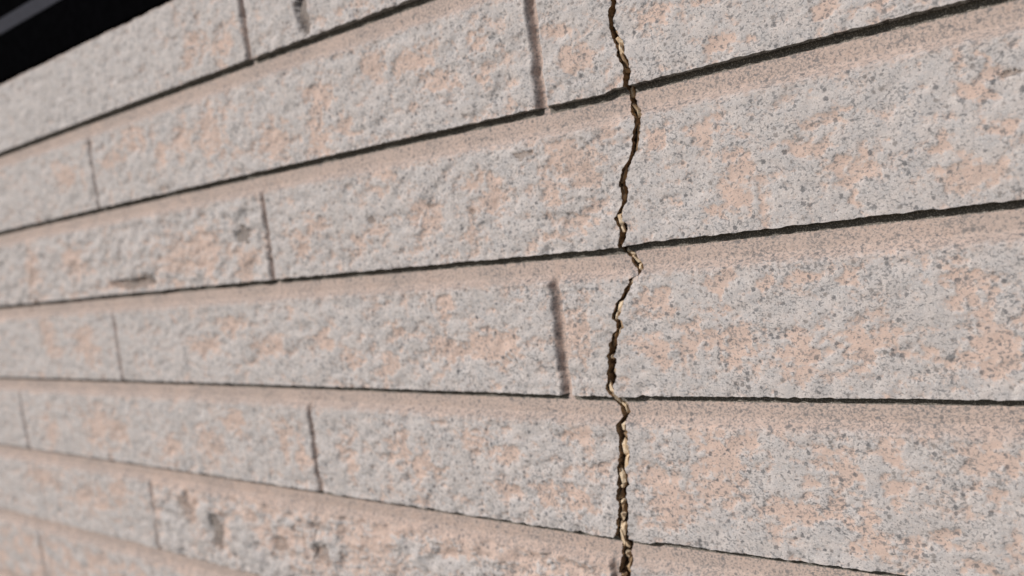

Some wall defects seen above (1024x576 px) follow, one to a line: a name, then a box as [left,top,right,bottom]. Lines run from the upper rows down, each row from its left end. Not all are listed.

crack [605,0,644,576]